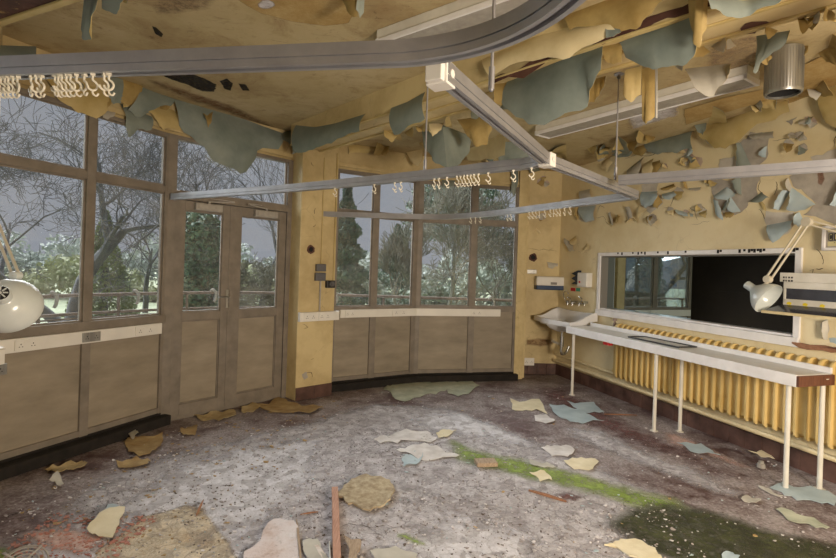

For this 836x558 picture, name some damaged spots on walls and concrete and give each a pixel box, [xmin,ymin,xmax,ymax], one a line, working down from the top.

peeling [0,45,36,56]
peeling [81,0,127,40]
peeling [482,0,836,174]
peeling [46,77,365,174]
peeling [374,92,505,167]
flaking render [575,172,836,243]